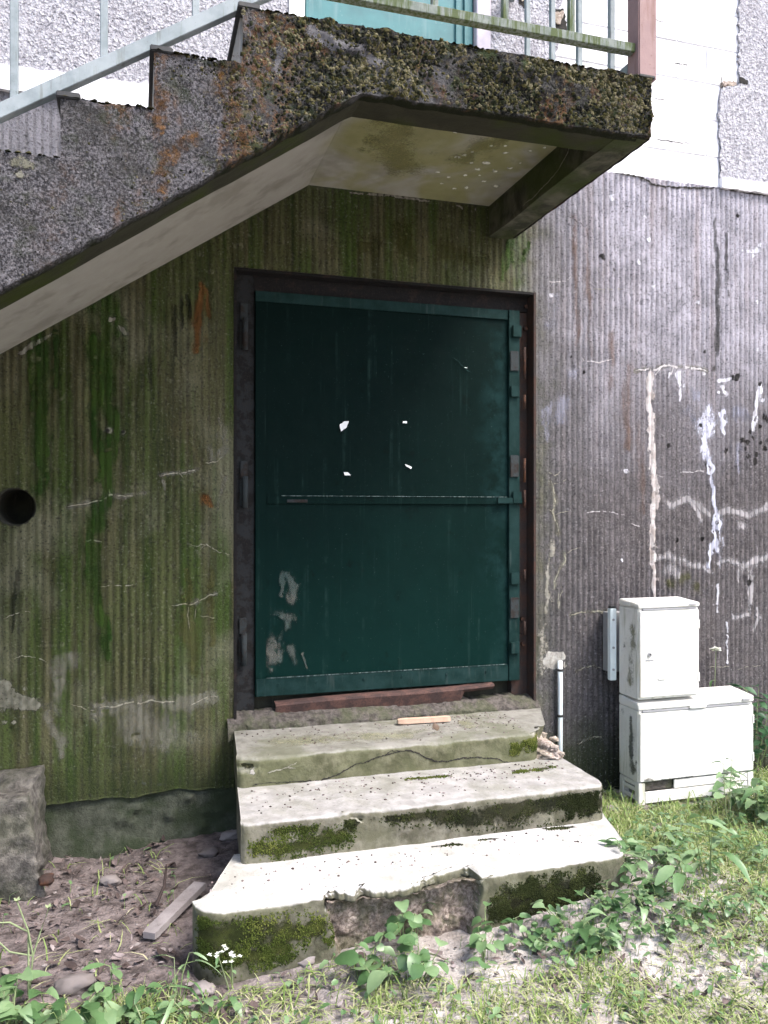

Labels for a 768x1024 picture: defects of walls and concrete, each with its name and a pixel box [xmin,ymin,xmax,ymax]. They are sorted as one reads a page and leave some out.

water stain [713,219,730,354]
water stain [646,366,768,664]
crack [253,750,510,786]
spalling [325,877,483,955]